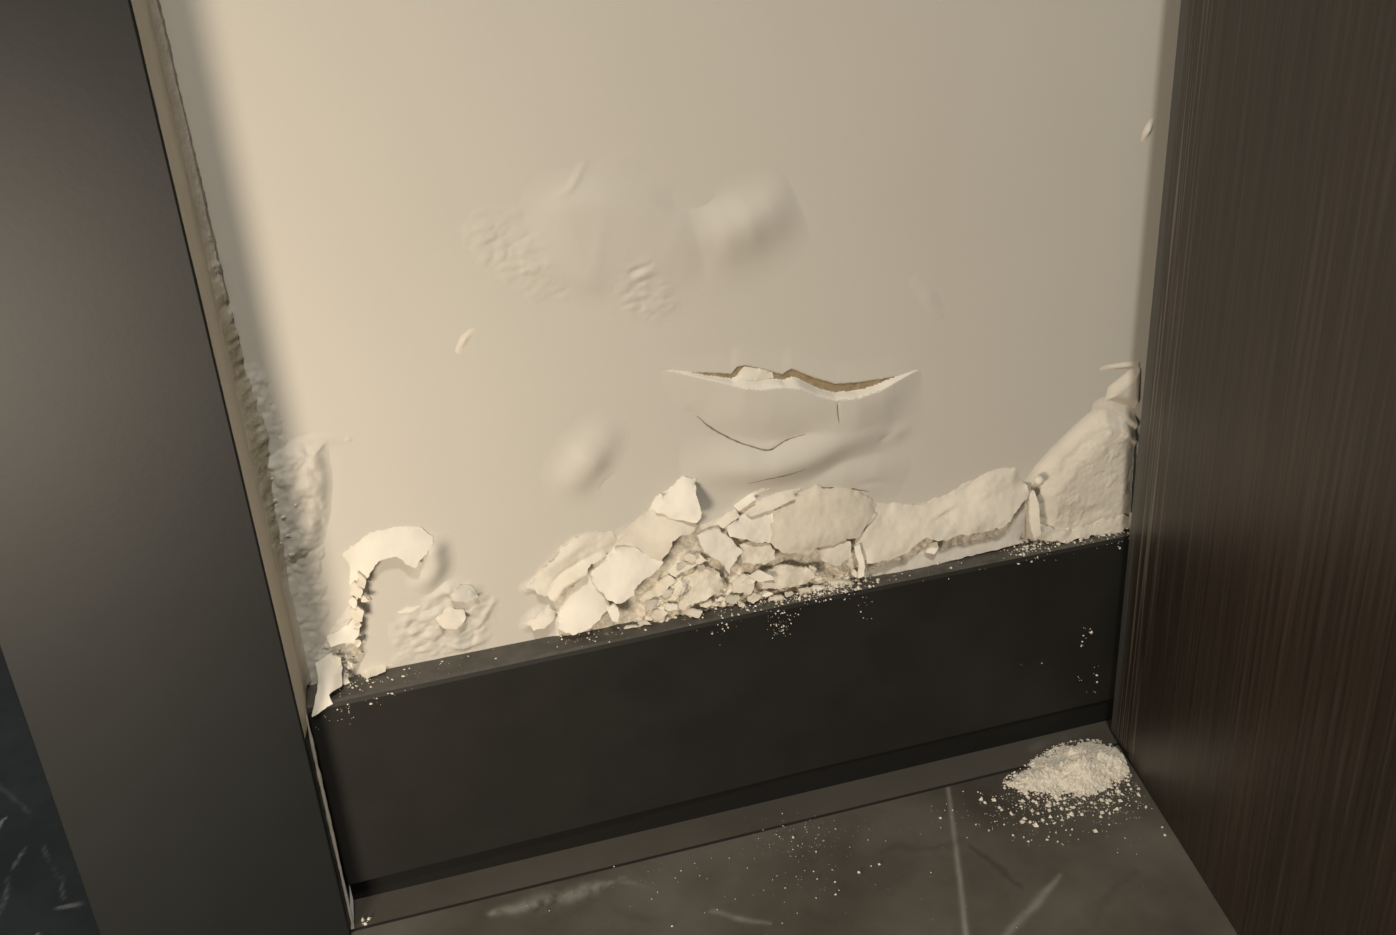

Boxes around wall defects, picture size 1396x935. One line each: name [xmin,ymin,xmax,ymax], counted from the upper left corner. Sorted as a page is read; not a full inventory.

peeling [243,362,289,457]
crack [661,341,920,421]
peeling [286,526,478,717]
flaking render [517,467,1044,636]